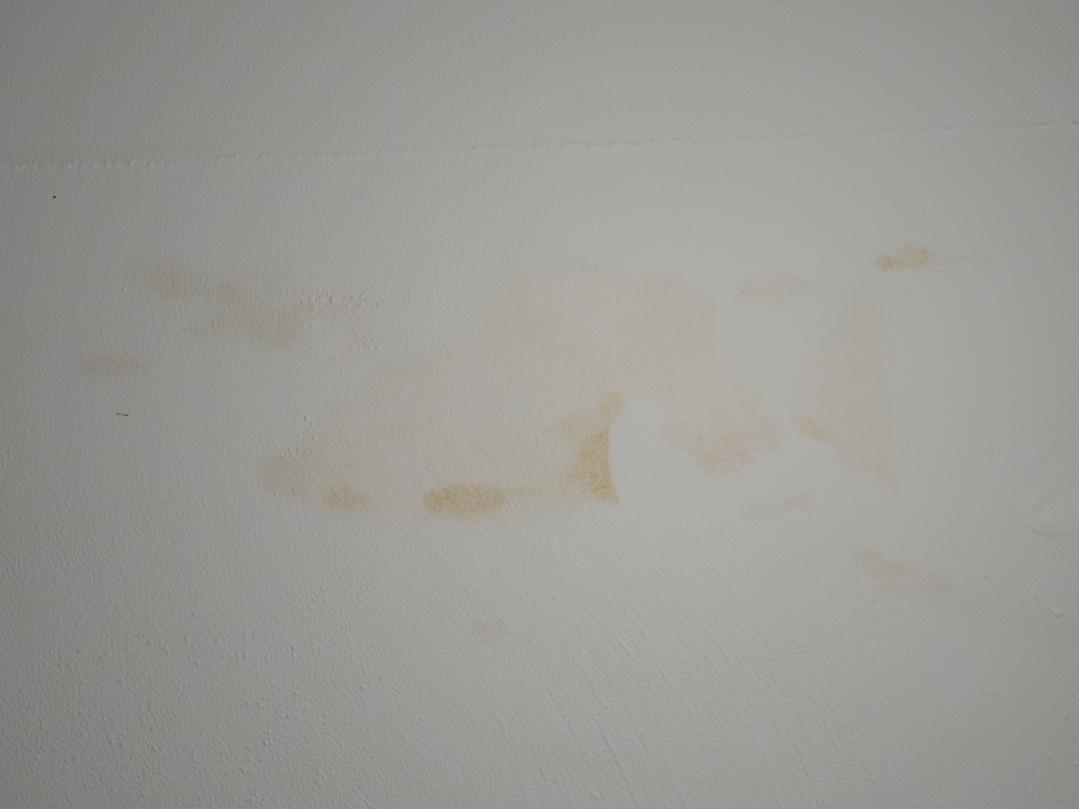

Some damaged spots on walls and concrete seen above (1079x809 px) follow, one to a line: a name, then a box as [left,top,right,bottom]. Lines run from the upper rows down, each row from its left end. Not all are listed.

water stain [113,243,390,371]
water stain [254,435,374,520]
water stain [416,350,685,526]